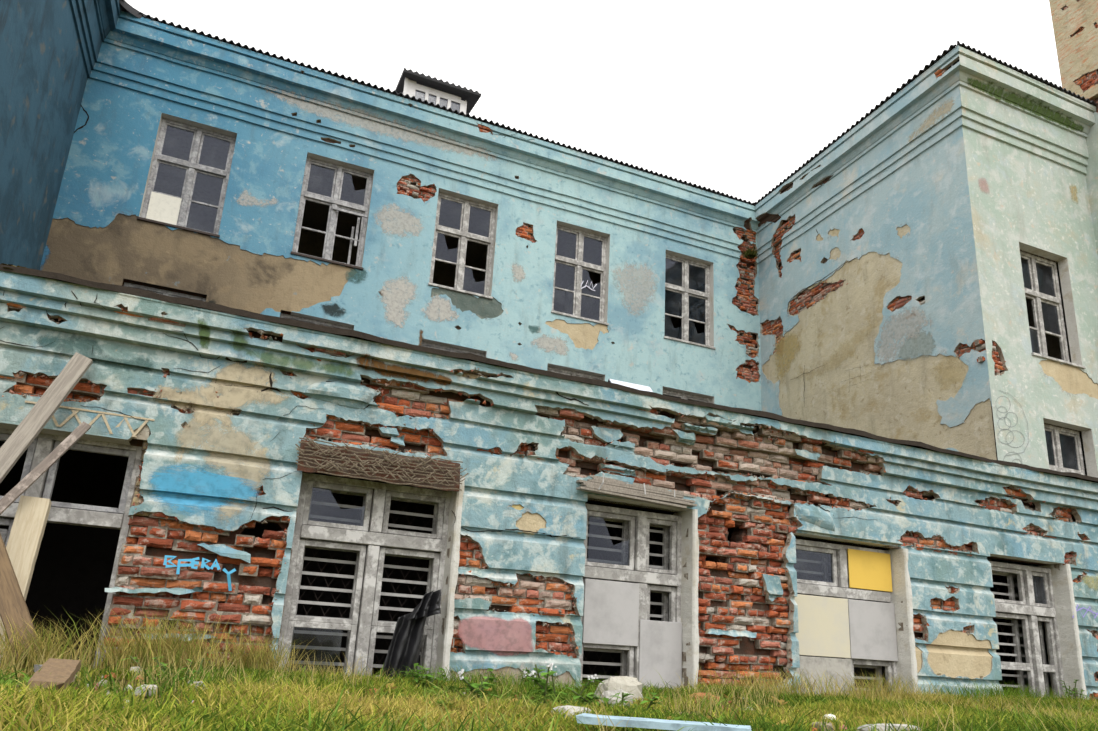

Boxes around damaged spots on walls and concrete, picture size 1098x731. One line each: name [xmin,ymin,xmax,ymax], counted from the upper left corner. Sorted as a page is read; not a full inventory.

peeling [40,214,354,314]
spalling [0,370,57,398]
spalling [64,380,106,402]
peeling [127,362,311,517]
spalling [303,375,495,456]
spalling [449,367,511,379]
spalling [477,442,541,459]
peeling [536,213,1008,689]
spalling [103,431,298,668]
peeling [509,504,546,535]
spalling [441,616,466,653]
spalling [445,534,580,658]